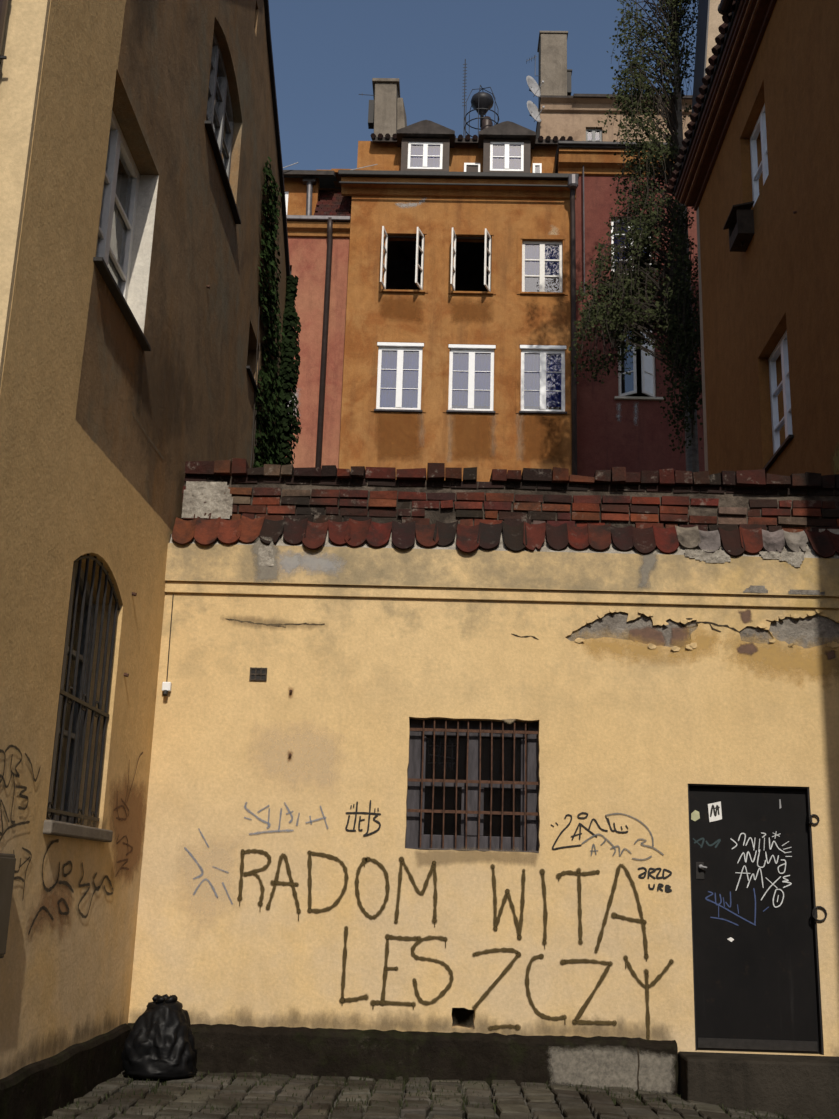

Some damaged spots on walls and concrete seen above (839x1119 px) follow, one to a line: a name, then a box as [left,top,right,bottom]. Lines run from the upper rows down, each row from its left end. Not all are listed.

flaking render [182,481,233,519]
crack [227,619,325,628]
flaking render [565,608,714,660]